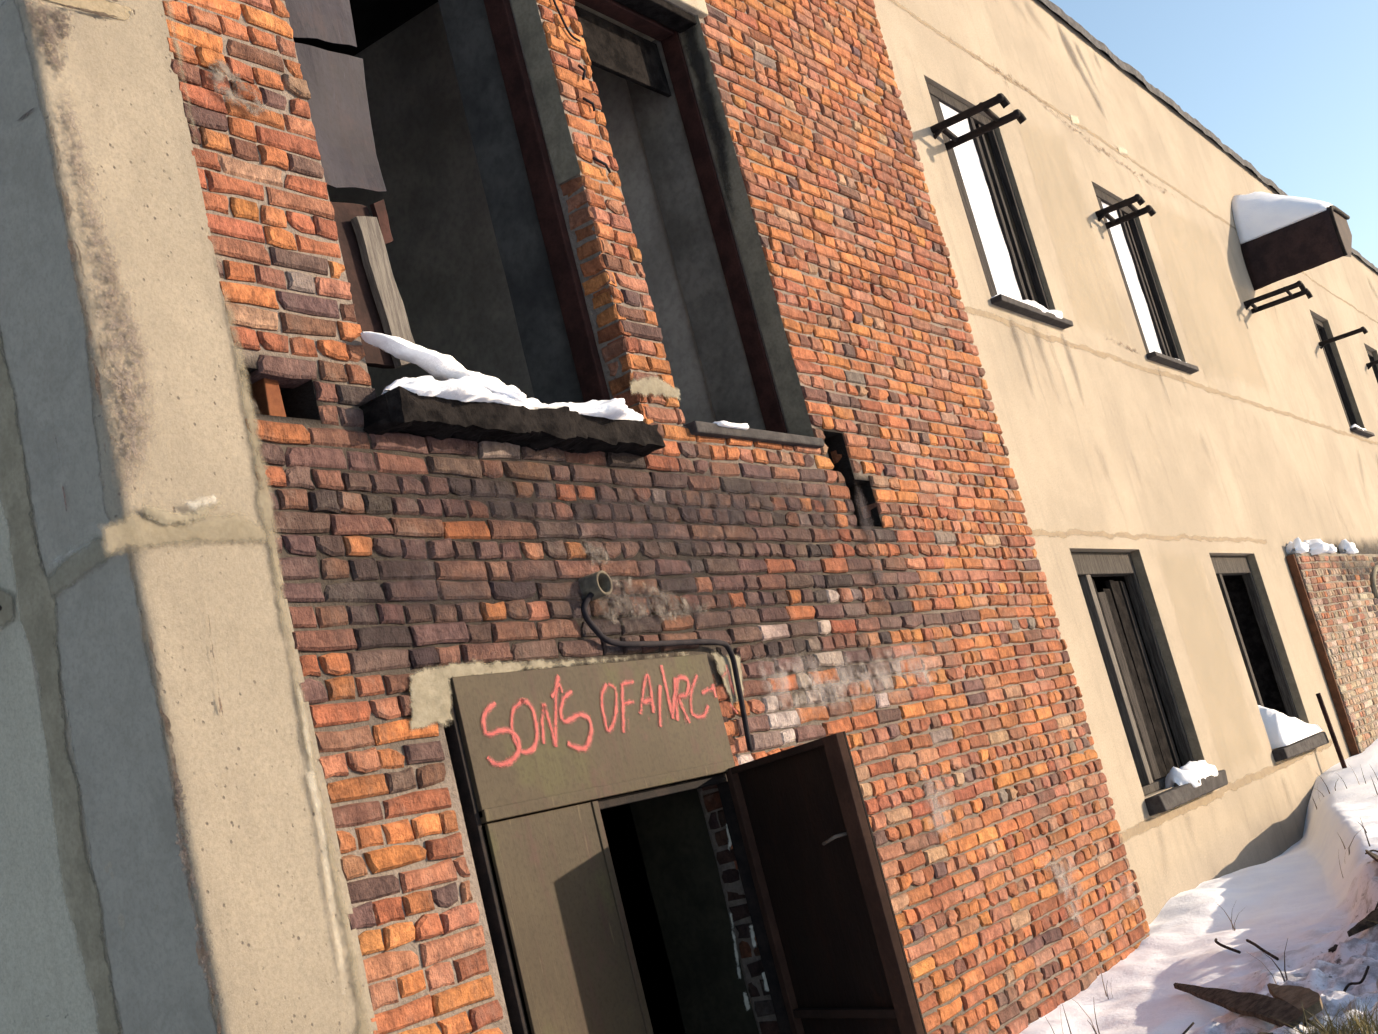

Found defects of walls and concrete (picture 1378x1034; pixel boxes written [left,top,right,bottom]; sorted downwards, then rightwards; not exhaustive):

crack [149,635,181,831]
crack [187,870,222,1034]